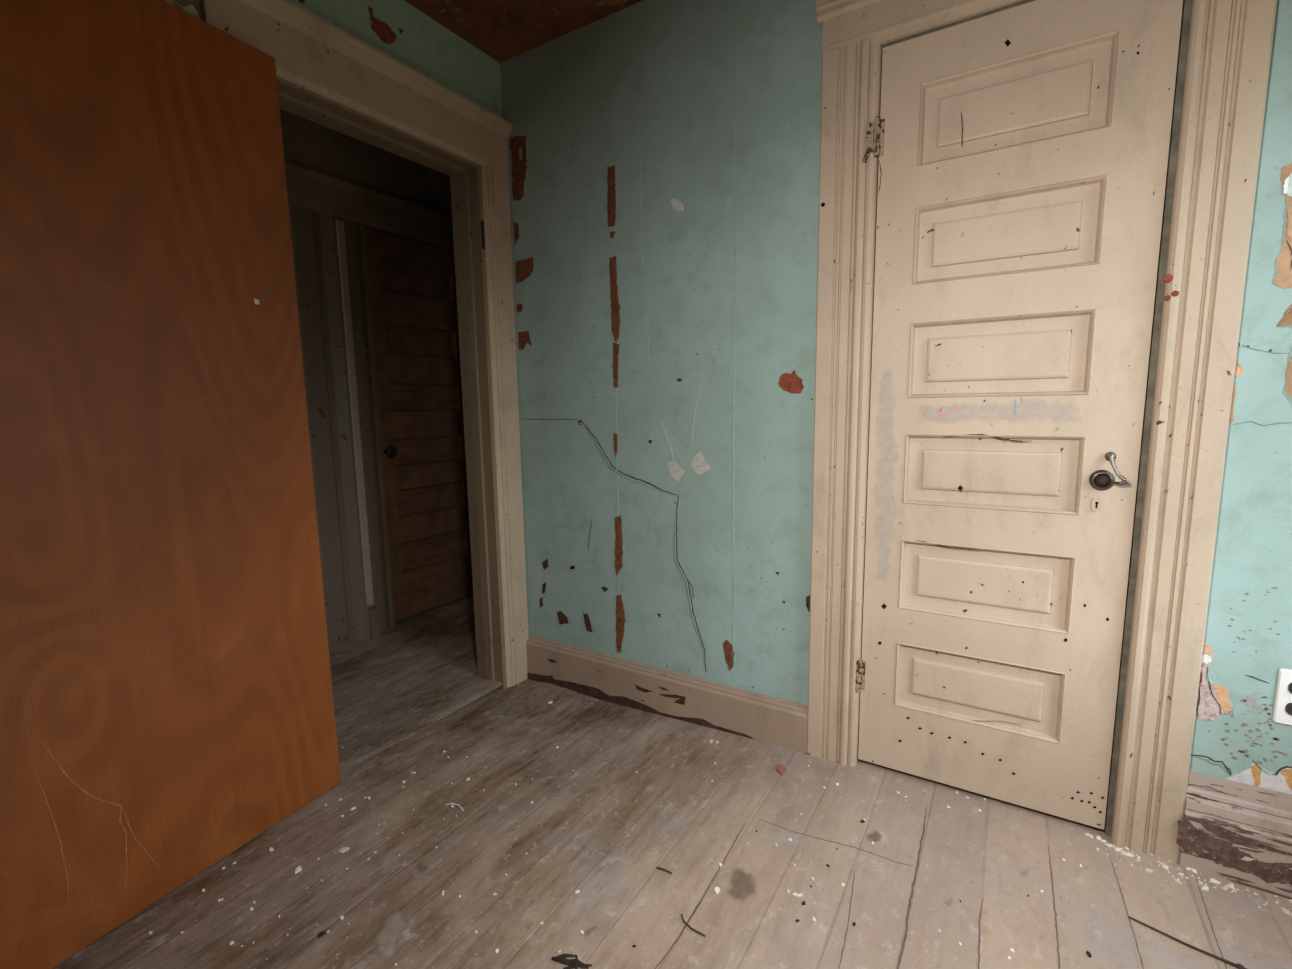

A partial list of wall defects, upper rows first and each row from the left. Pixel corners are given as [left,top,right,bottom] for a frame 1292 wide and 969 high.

peeling [509,135,528,201]
peeling [515,257,534,283]
peeling [518,331,532,350]
peeling [601,32,626,653]
peeling [778,369,805,395]
flaking render [1276,304,1292,407]
crack [531,419,706,672]
peeling [527,658,753,739]
spalling [1195,642,1292,794]
peeling [1176,817,1292,885]